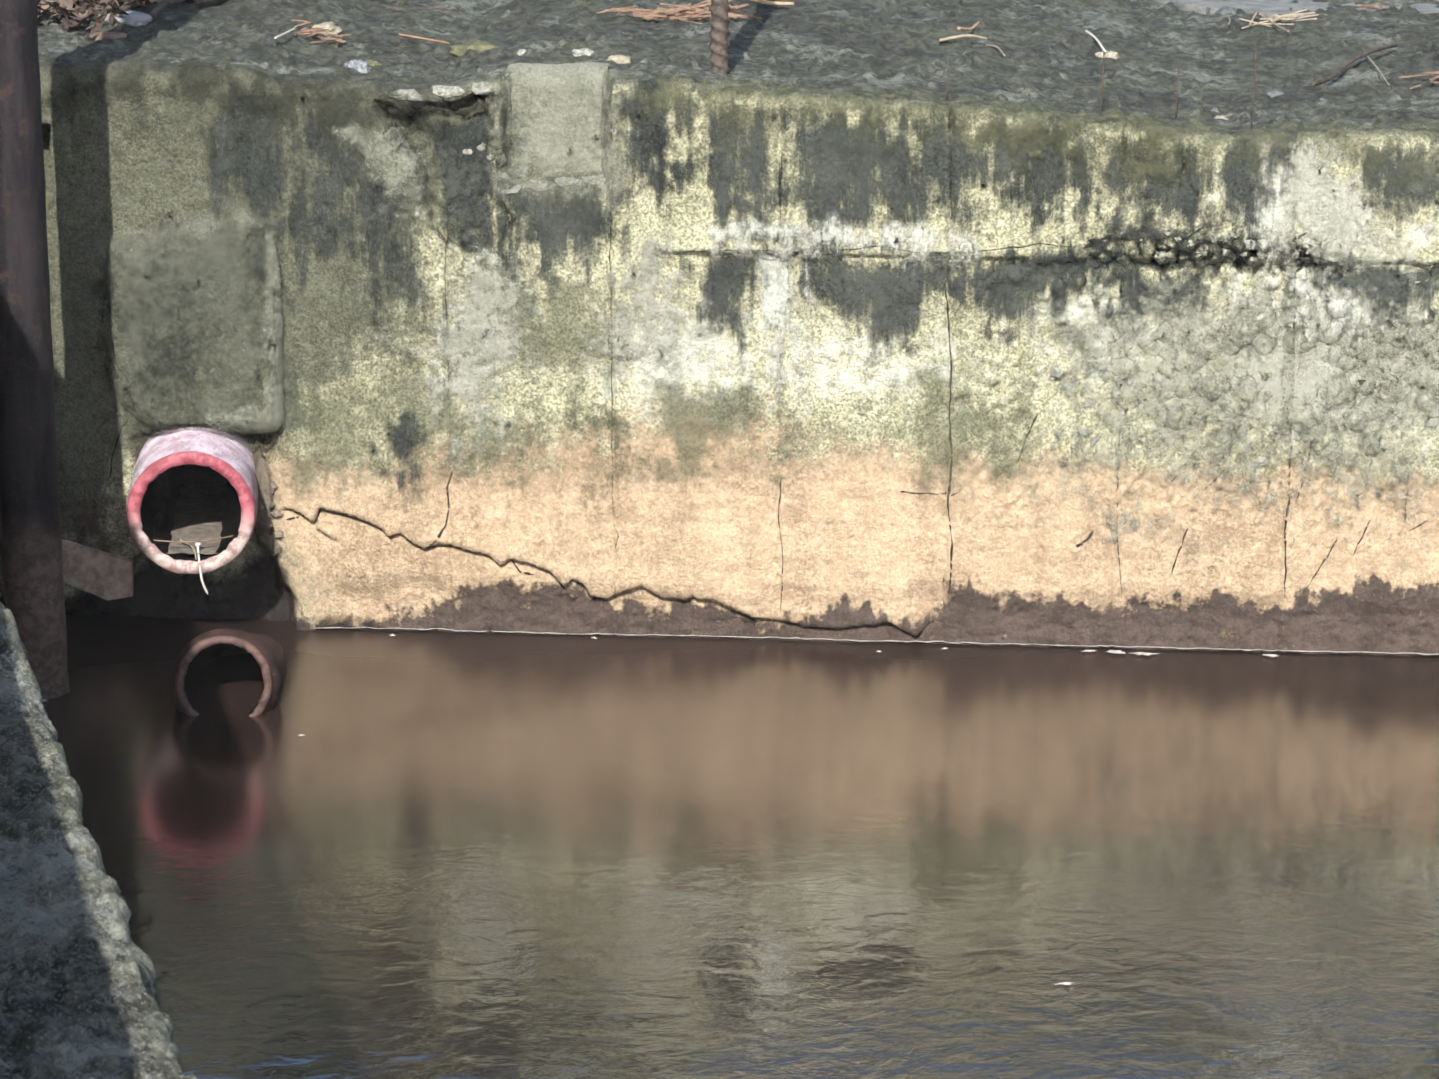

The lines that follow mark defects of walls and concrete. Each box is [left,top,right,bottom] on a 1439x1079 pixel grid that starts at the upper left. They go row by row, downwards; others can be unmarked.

leakage [91,93,429,425]
crack [285,201,637,595]
leakage [372,75,1439,490]
crack [674,155,1439,620]
leakage [65,554,1439,656]